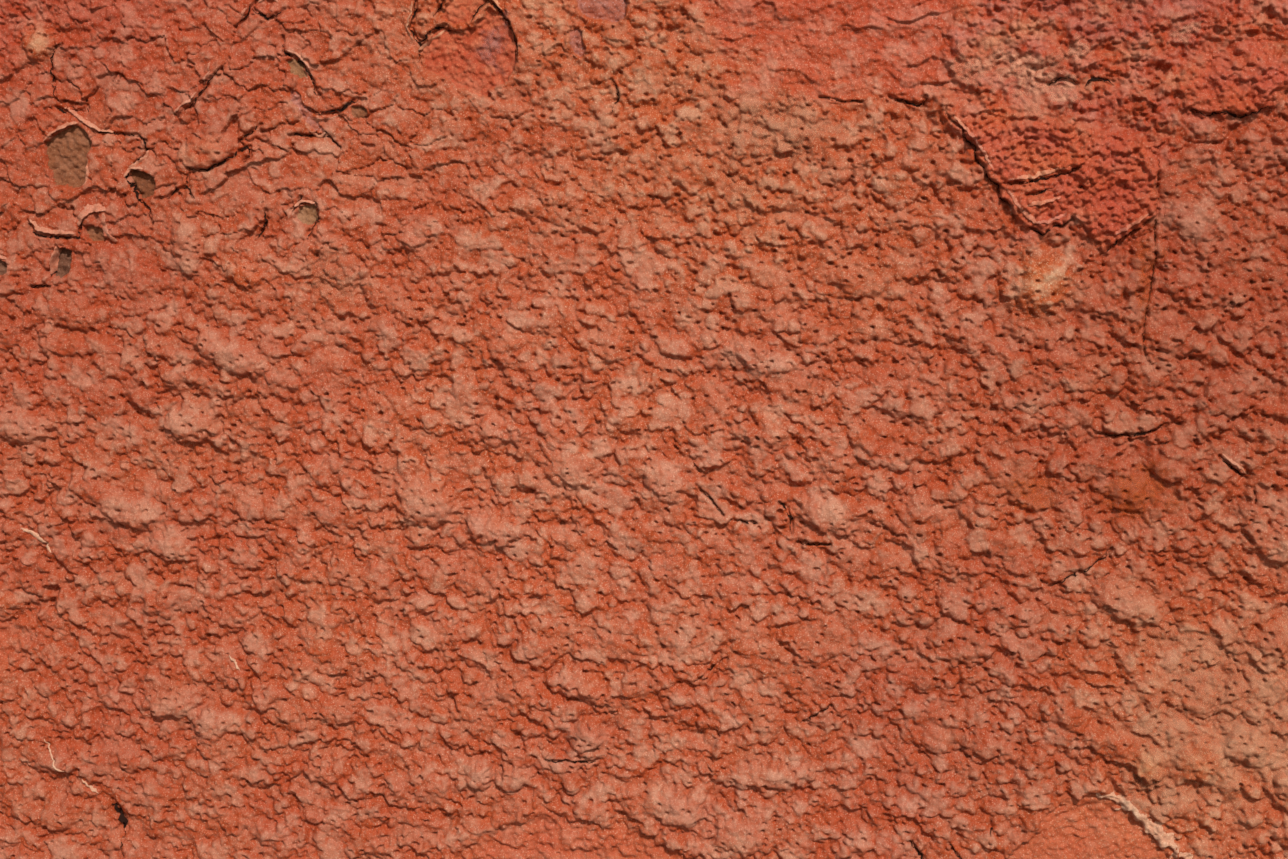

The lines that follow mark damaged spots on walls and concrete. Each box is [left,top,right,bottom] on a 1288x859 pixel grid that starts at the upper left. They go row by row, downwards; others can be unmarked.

crack [405,0,518,61]
crack [235,0,369,148]
crack [0,212,82,239]
peeling [49,246,72,278]
peeling [43,121,92,188]
peeling [77,203,118,243]
peeling [124,166,155,198]
crack [50,44,261,225]
peeling [294,200,318,225]
crack [897,96,1084,235]
crack [1103,150,1160,365]
spalling [1007,792,1193,859]